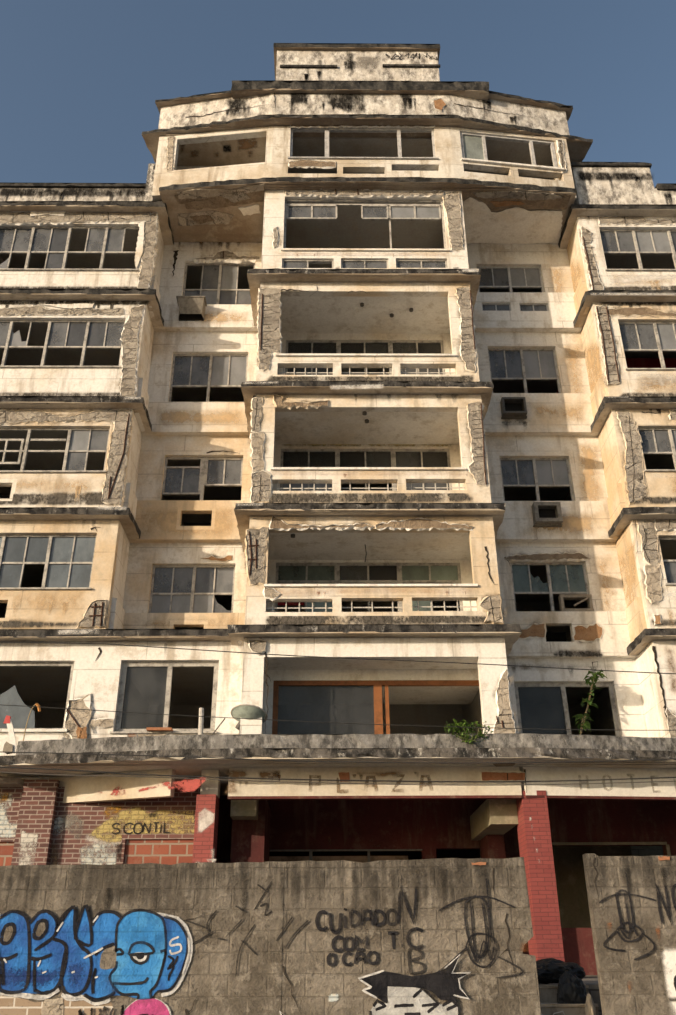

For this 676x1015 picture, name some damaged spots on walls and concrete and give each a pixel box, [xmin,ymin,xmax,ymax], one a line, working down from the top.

leakage [226,98,247,116]
leakage [291,93,307,107]
leakage [322,93,364,112]
spalling [596,306,620,383]
spalling [98,414,130,509]
flaking render [643,564,664,626]
flaking render [519,623,546,640]
flaking render [572,622,604,643]